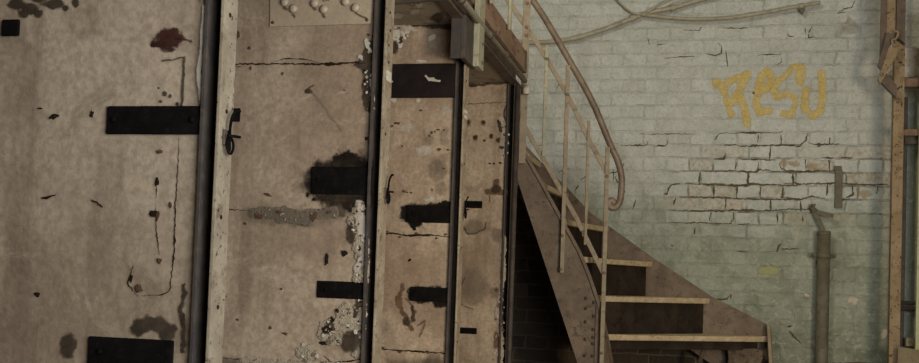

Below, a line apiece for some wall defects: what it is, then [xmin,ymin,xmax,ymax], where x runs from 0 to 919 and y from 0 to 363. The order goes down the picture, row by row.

peeling [393,3,423,54]
spalling [243,192,370,283]
peeling [239,298,368,363]